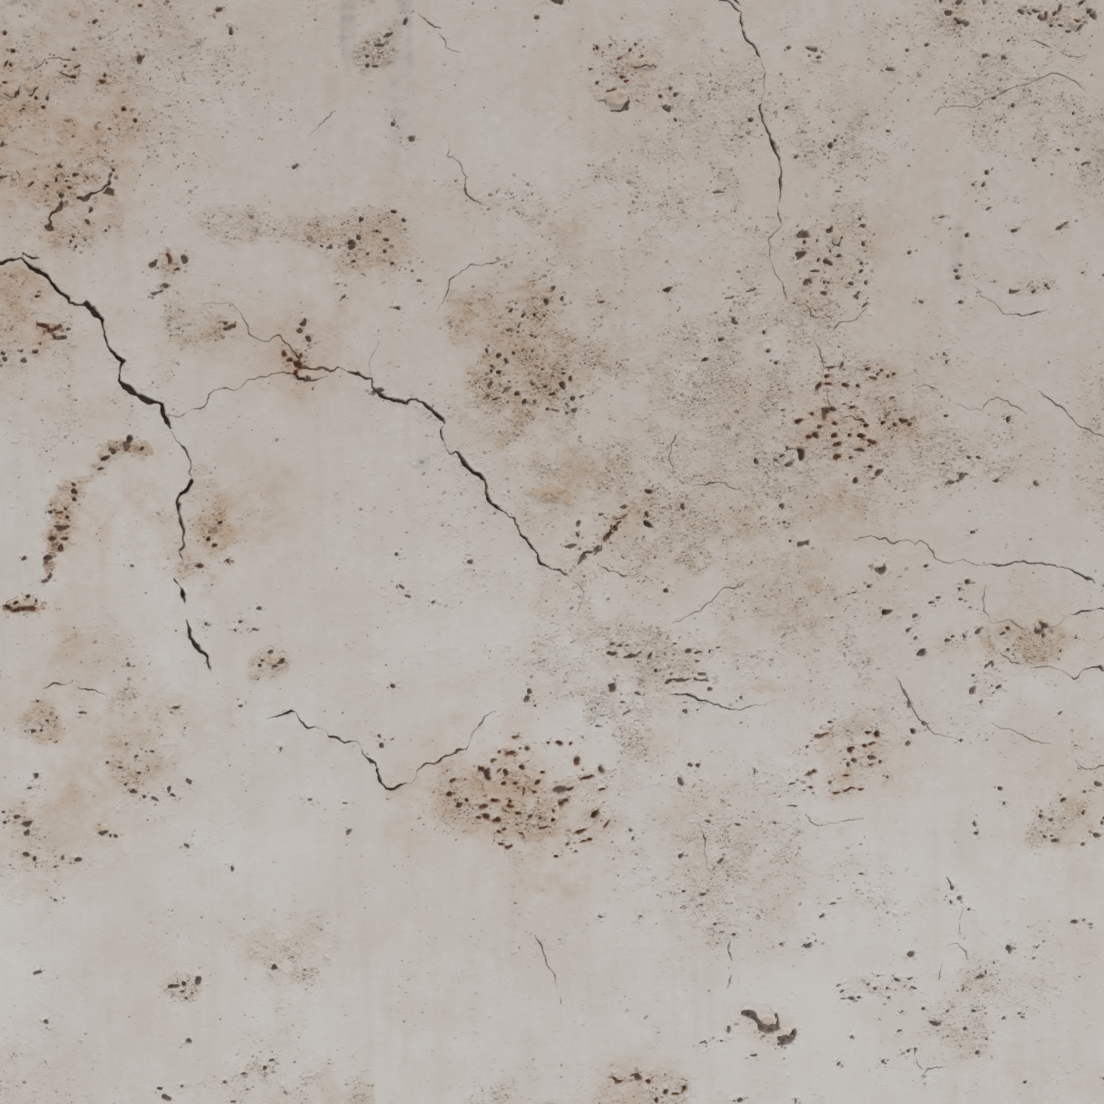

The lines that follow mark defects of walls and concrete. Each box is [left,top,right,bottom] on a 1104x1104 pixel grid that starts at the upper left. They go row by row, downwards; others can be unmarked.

crack [719,0,871,408]
crack [0,252,634,675]
crack [852,535,1104,630]
crack [999,652,1104,681]
crack [266,710,496,792]